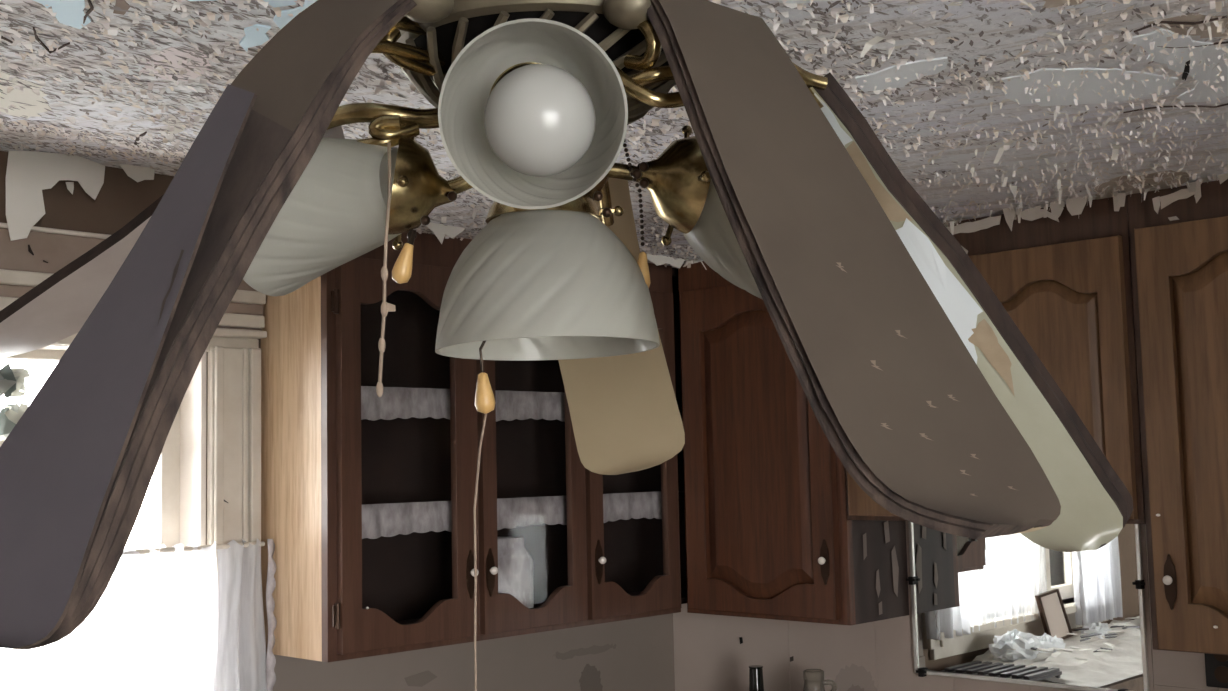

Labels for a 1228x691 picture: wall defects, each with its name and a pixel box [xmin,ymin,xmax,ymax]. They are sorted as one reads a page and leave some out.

crack [1,0,94,54]
crack [1134,16,1228,48]
peeling [0,0,318,263]
peeling [342,122,372,139]
peeling [343,63,425,109]
peeling [419,128,460,180]
peeling [618,107,691,164]
crack [1123,103,1228,113]
peeling [629,187,700,269]